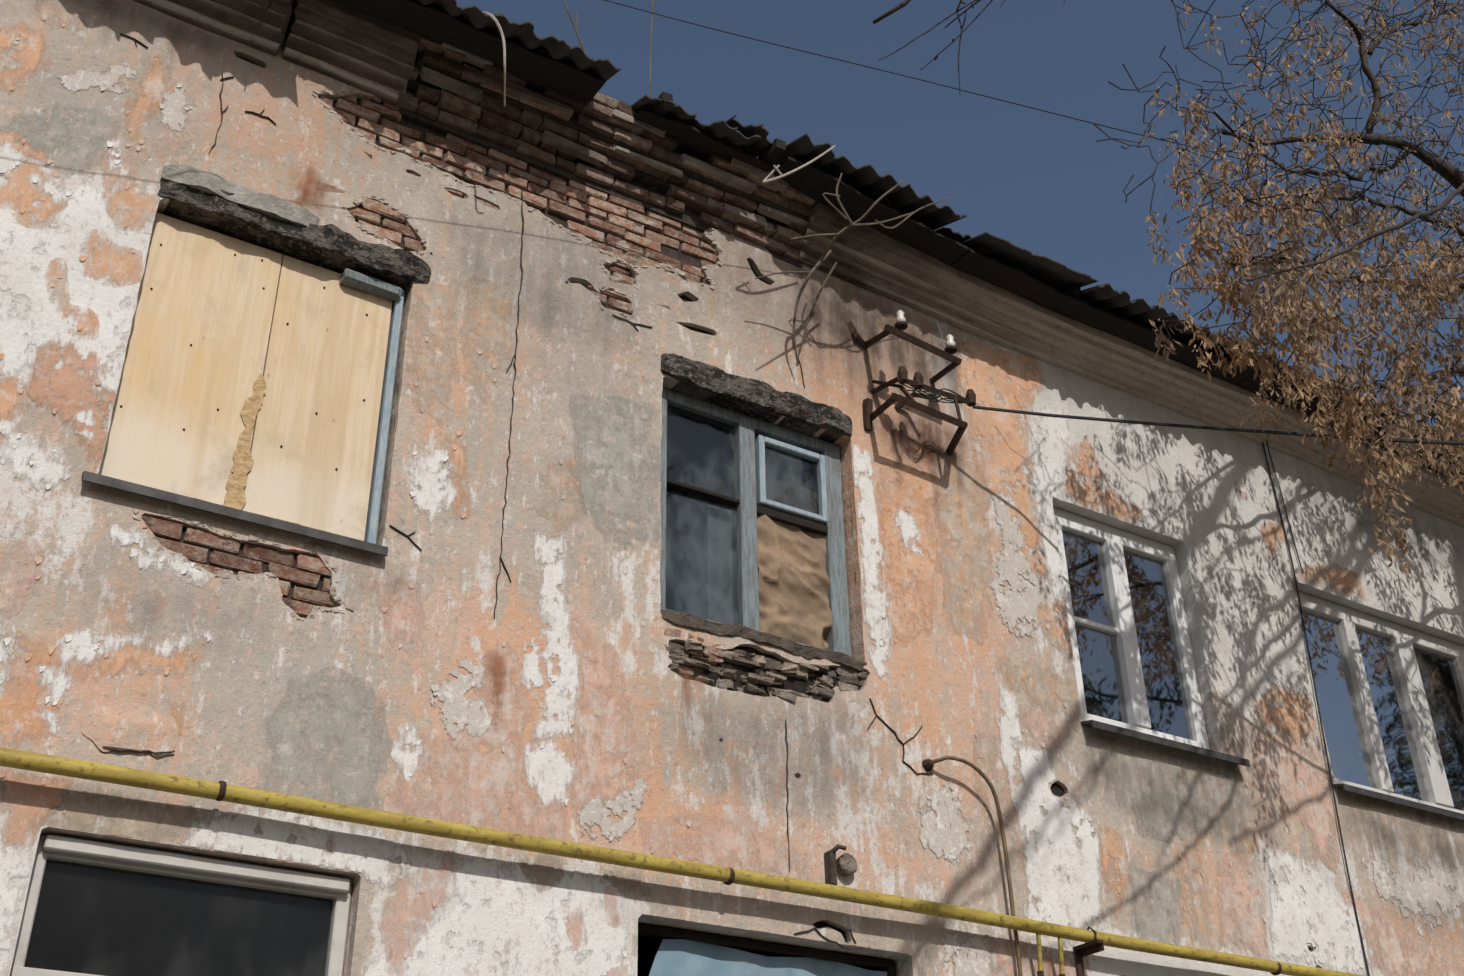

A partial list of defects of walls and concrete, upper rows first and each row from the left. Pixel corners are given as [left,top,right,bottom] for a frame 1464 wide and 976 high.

peeling [0,0,82,92]
peeling [0,54,196,491]
flaking render [110,508,354,625]
crack [494,189,524,619]
flaking render [312,88,723,319]
peeling [663,339,1142,703]
peeling [0,532,809,976]
crack [867,698,933,774]
peeling [917,657,1131,976]